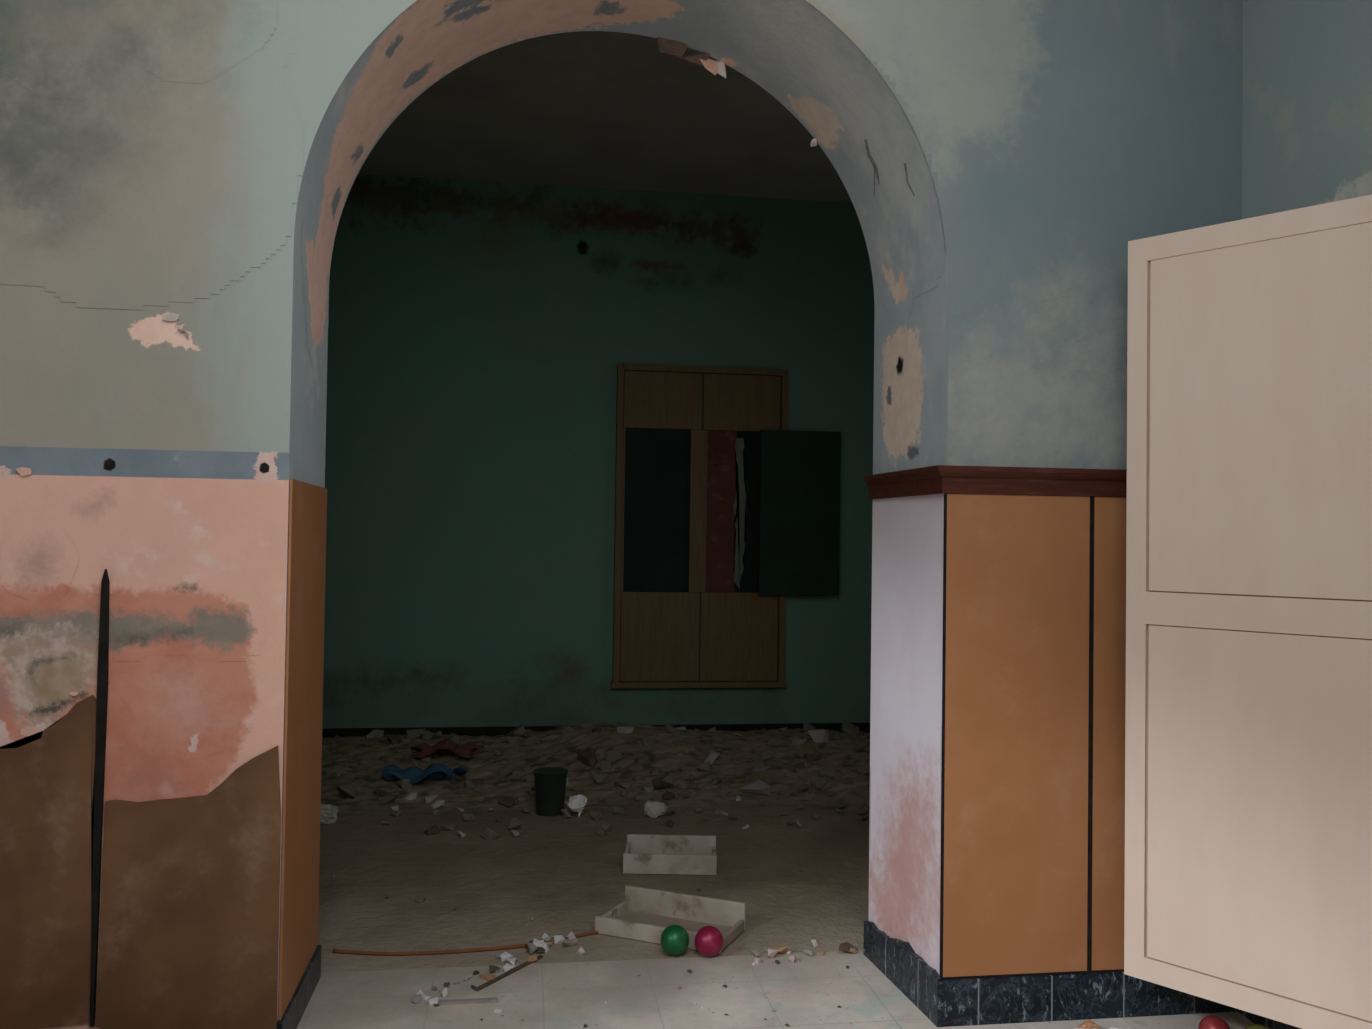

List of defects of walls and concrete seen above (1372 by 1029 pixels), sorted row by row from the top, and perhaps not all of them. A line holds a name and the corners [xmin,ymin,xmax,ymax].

peeling [95,0,277,84]
damp [334,174,784,305]
peeling [301,0,1155,473]
peeling [116,302,214,364]
peeling [0,457,32,486]
peeling [246,443,287,490]
damp [64,563,279,855]
peeling [154,775,178,800]